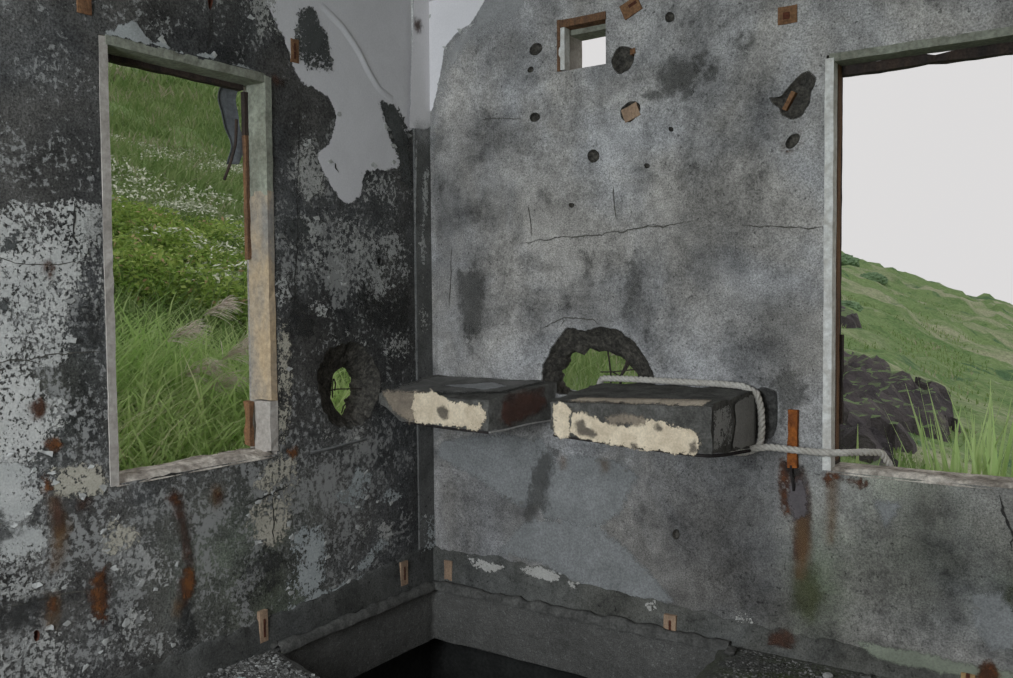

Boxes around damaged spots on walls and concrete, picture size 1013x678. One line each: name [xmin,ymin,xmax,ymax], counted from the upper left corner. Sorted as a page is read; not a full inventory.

peeling [245,0,485,303]
crack [526,188,691,244]
crack [738,223,818,231]
peeling [0,198,109,602]
corrosion [168,492,196,608]
peeling [243,270,410,610]
peeling [411,390,672,603]
peeling [541,326,733,456]
corrosion [778,458,812,567]
corrosion [823,472,868,500]
crack [999,495,1013,548]
corrosion [977,663,1000,678]